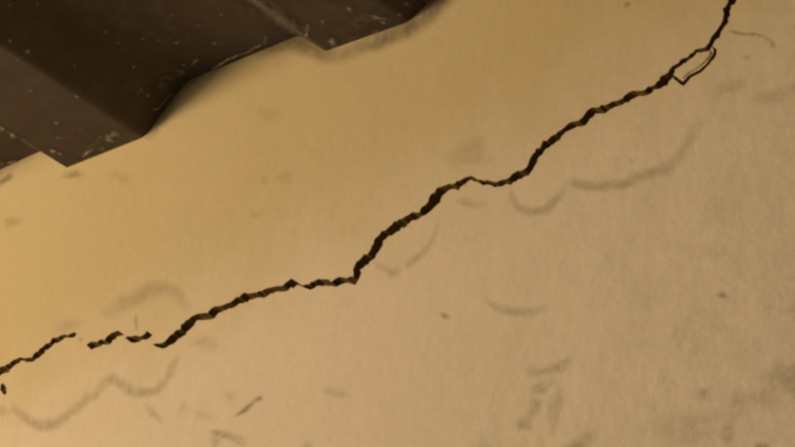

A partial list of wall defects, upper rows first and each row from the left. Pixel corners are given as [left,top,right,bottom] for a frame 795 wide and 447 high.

crack [0,0,736,375]